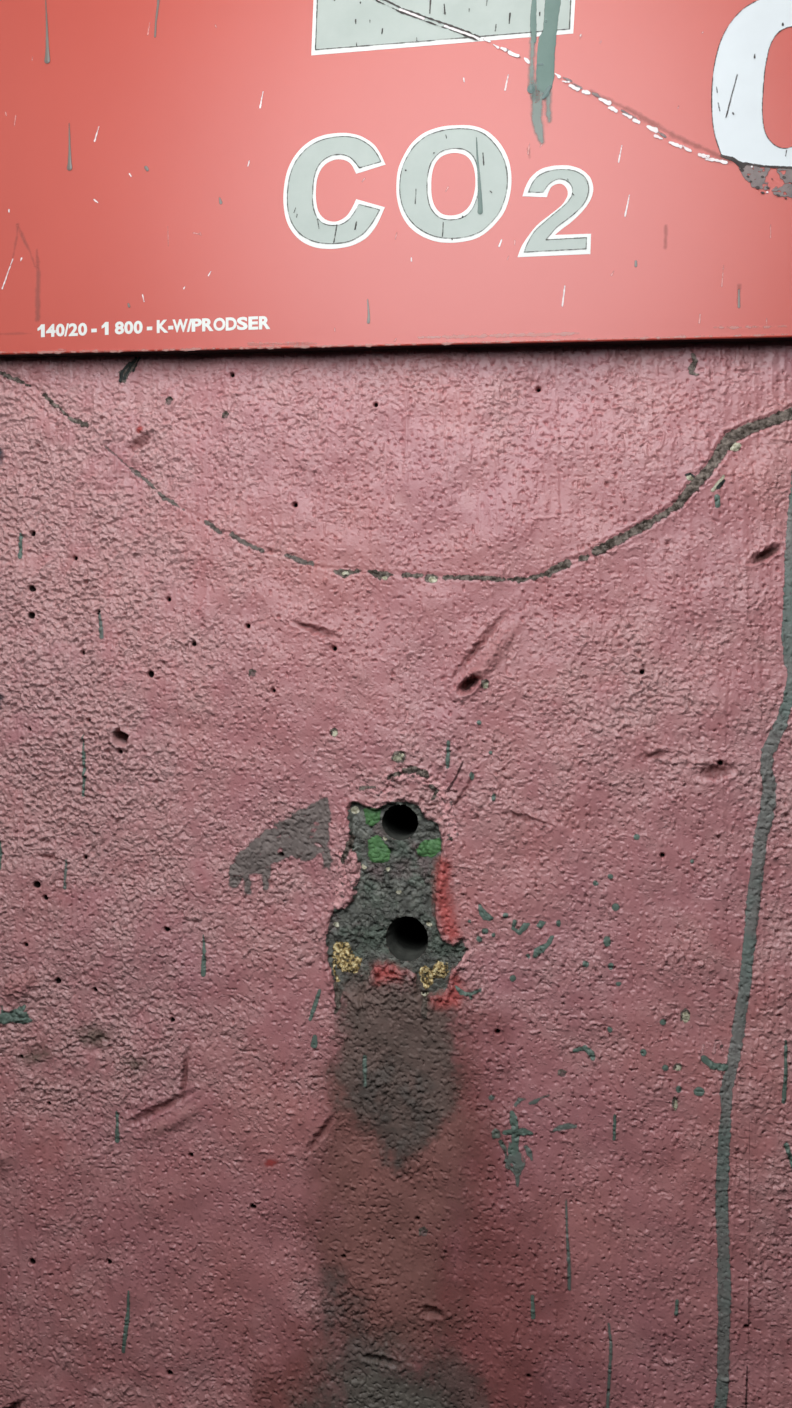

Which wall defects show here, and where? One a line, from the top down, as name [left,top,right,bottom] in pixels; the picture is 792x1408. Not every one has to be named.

crack [0,371,792,583]
spalling [325,751,474,1020]
crack [743,1300,751,1408]